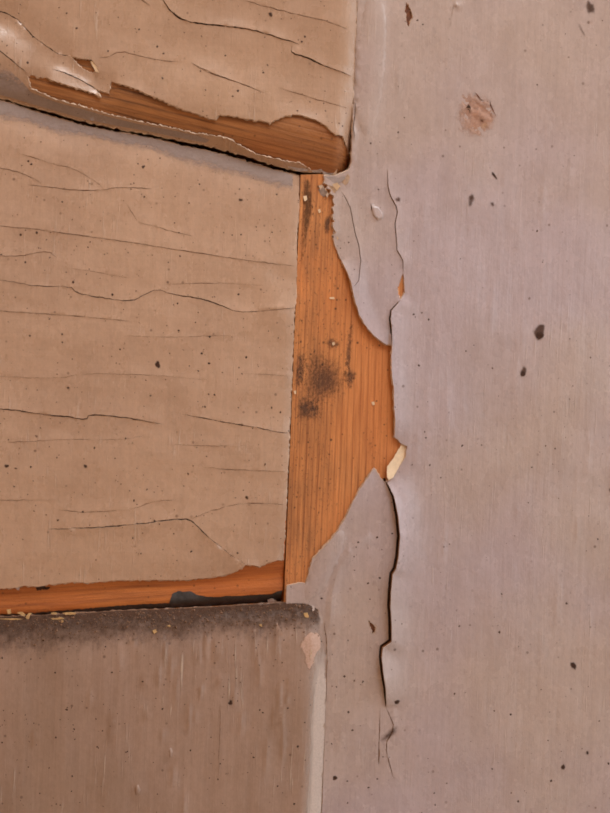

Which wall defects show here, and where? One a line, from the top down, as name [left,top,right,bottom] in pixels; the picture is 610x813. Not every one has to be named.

crack [0,11,95,89]
crack [142,0,348,75]
crack [193,64,355,137]
peeling [462,93,495,129]
crack [1,251,290,337]
peeling [0,75,407,616]
leakage [297,326,355,415]
crack [389,302,398,339]
crack [2,409,160,443]
crack [54,500,283,566]
peeling [300,632,321,669]
crack [378,478,399,776]